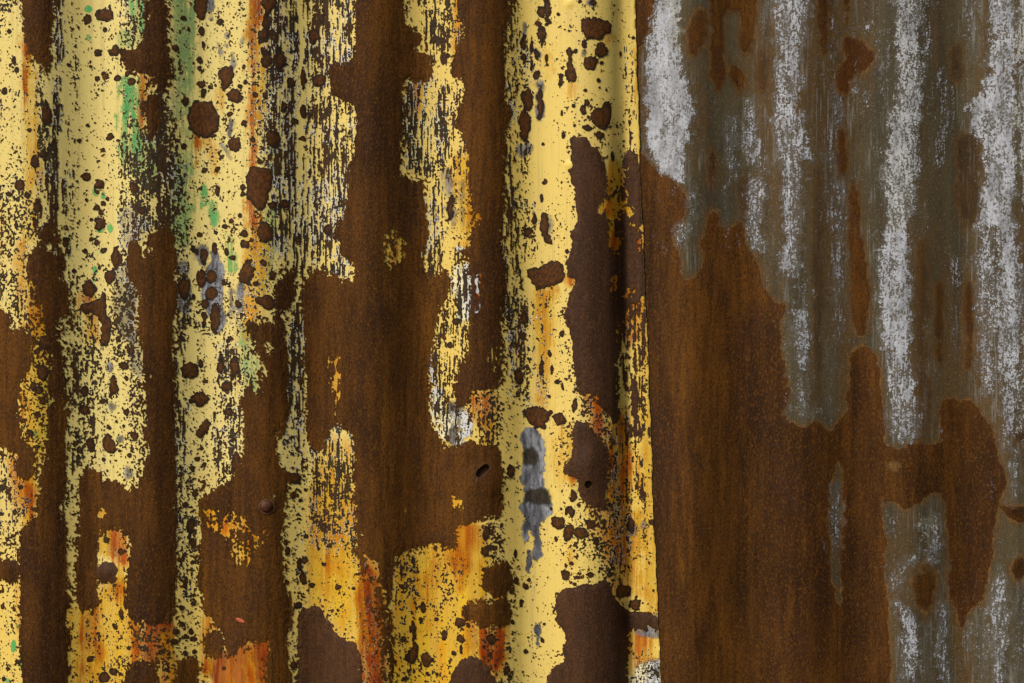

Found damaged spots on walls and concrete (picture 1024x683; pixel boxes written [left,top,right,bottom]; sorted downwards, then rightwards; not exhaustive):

corrosion [0,0,538,683]
peeling [0,0,661,683]
corrosion [520,101,1024,683]